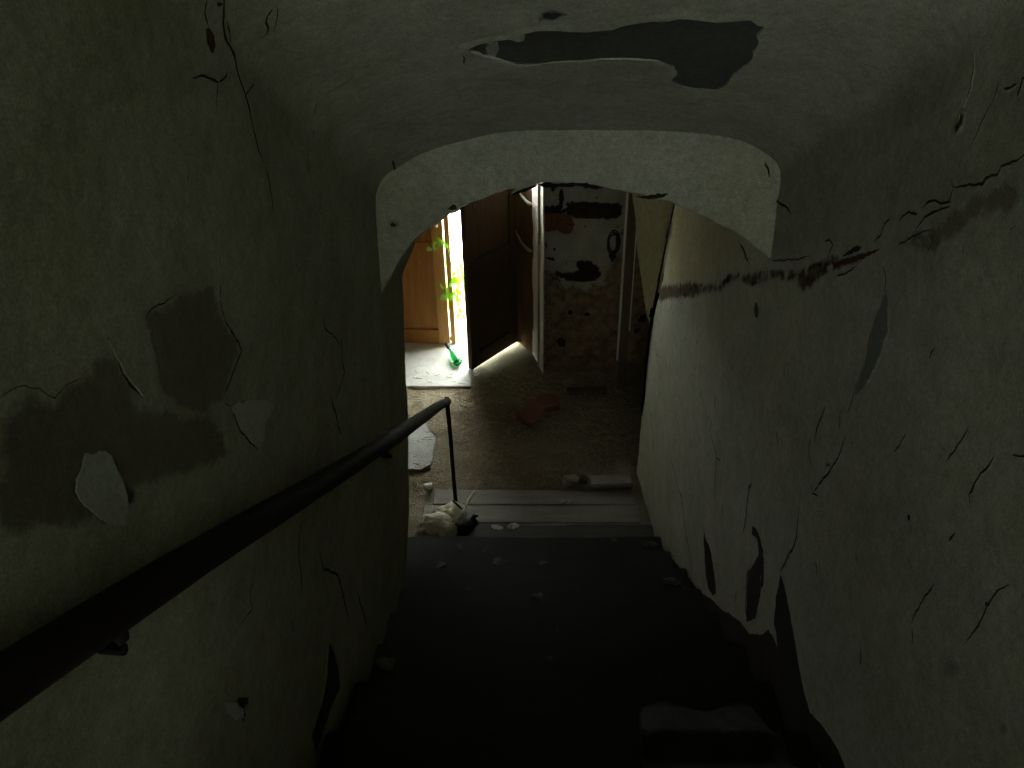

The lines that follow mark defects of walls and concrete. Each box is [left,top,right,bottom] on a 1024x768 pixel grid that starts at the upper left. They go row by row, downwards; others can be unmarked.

crack [262,6,278,39]
flaking render [457,12,776,91]
crack [193,0,273,207]
flaking render [512,182,623,234]
crack [874,155,1024,253]
corrosion [658,254,861,302]
peeling [839,266,890,428]
flaking render [689,483,845,768]